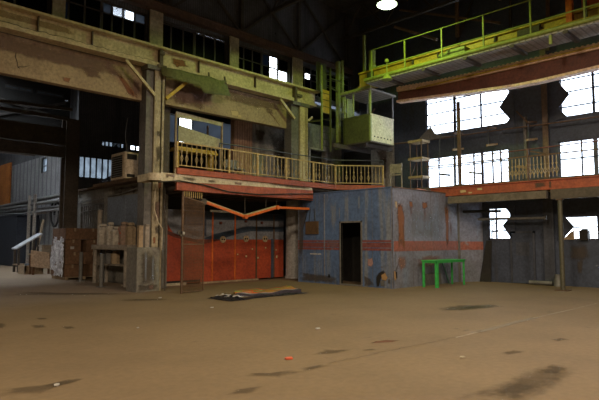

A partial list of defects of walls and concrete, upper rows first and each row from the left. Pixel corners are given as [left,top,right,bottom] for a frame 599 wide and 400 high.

spalling [376,271,397,286]